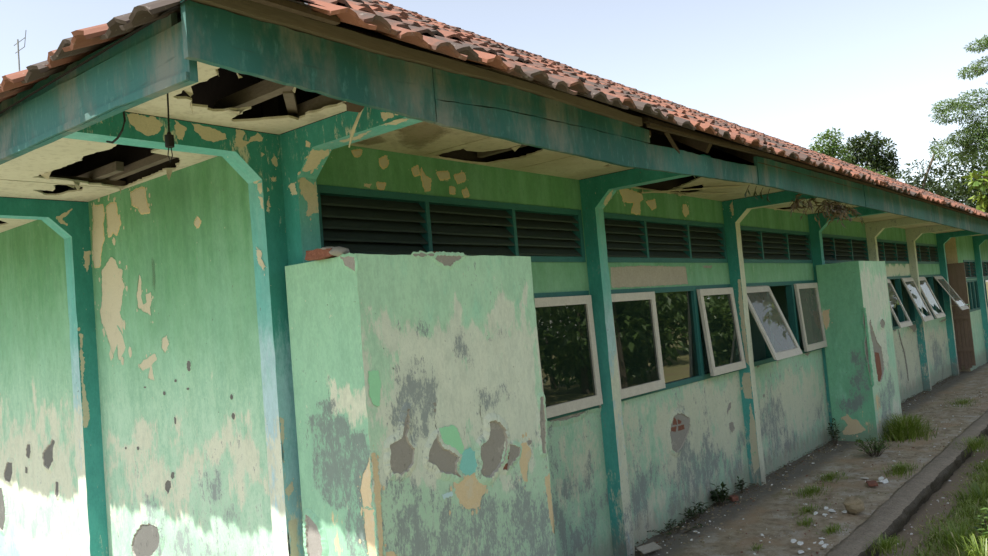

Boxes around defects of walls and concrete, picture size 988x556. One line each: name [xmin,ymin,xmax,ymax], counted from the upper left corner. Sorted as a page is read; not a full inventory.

peeling [126,113,279,212]
peeling [287,112,408,220]
peeling [411,165,470,198]
peeling [82,186,170,389]
flaking render [861,307,917,387]
flaking render [0,434,60,536]
flaking render [358,392,601,556]
flaking render [667,408,691,457]
flaking render [130,516,165,556]